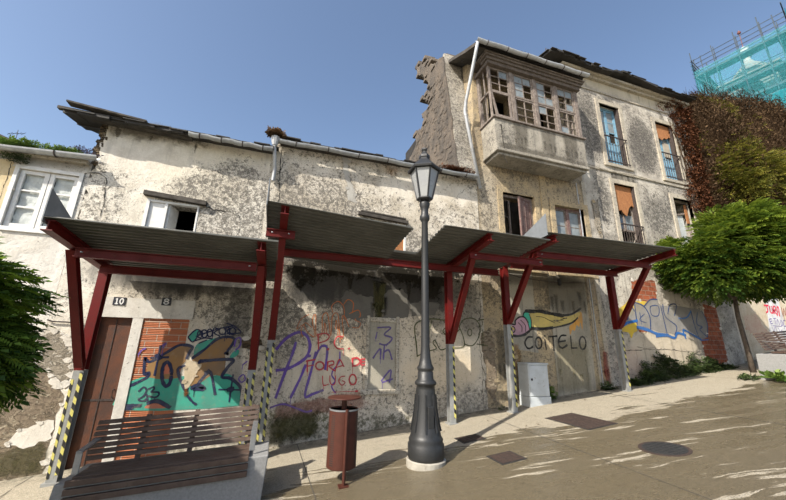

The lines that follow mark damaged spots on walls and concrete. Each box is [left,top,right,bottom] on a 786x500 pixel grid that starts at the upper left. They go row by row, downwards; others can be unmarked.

peeling [0,159,16,209]
damp [286,259,474,317]
spalling [631,278,657,302]
spalling [701,304,729,364]
peeling [0,328,73,481]